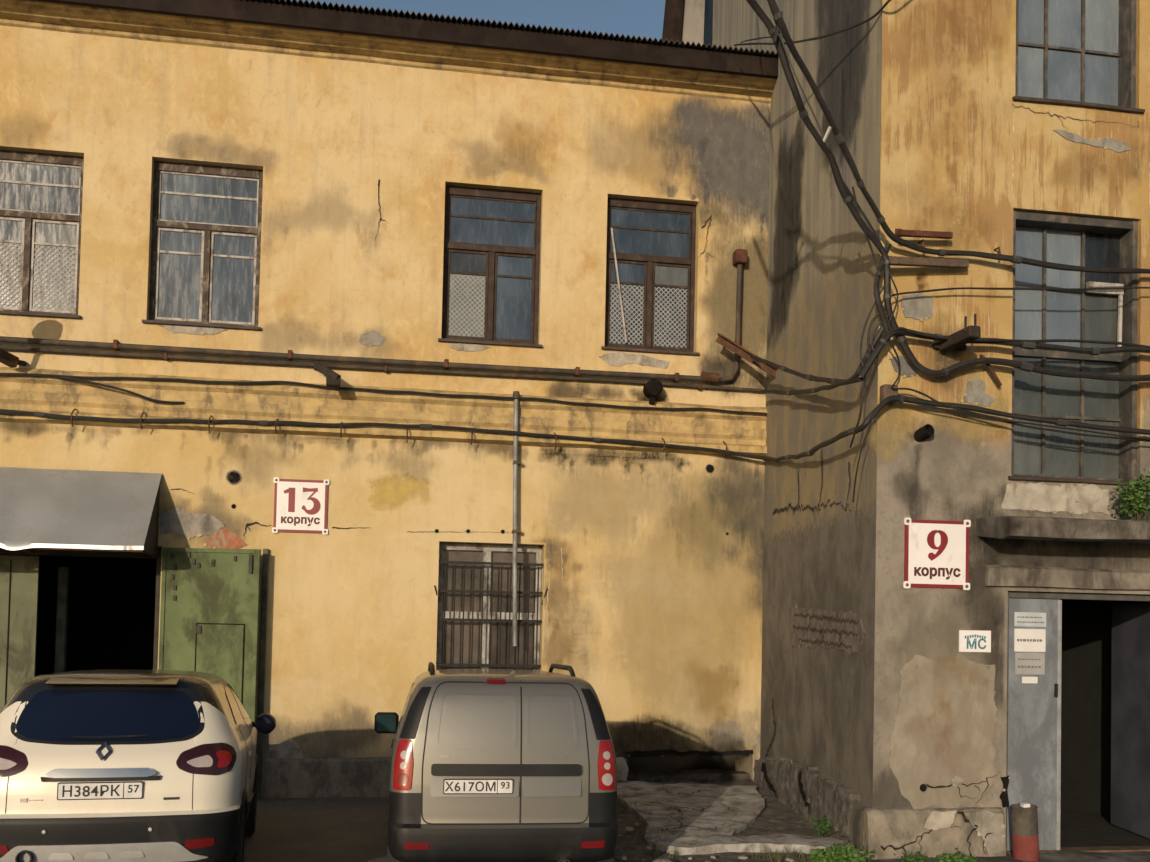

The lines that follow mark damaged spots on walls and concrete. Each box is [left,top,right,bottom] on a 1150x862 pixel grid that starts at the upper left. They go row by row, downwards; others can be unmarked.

damp [817,0,869,163]
peeling [1053,130,1130,153]
damp [664,99,803,365]
peeling [901,293,935,321]
peeling [598,352,669,368]
peeling [961,378,996,406]
spalling [226,470,242,485]
peeling [159,508,247,549]
damp [711,721,761,746]
peeling [887,653,1011,854]
crack [881,772,1000,855]